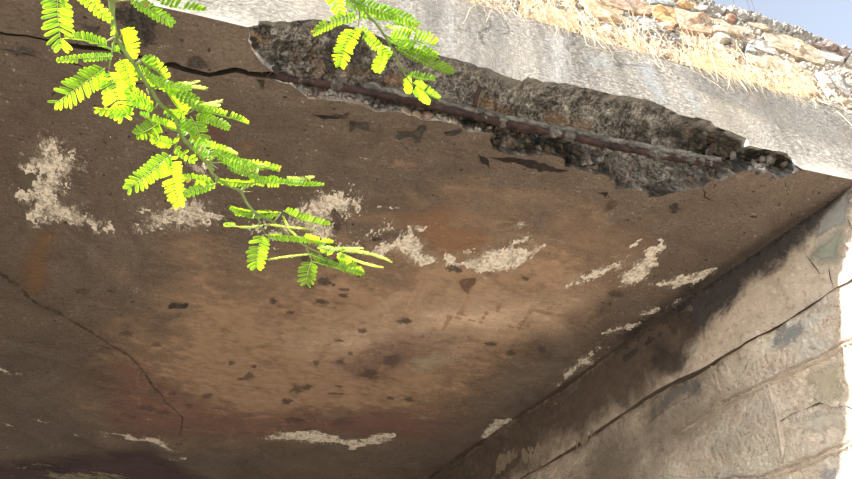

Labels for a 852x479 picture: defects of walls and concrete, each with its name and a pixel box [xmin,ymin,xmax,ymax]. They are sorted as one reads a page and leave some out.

crack [0,32,280,91]
spalling [248,20,801,198]
peeling [133,197,223,234]
damp [322,237,383,277]
peeling [244,183,546,295]
damp [306,277,350,298]
crack [0,272,184,434]
damp [425,188,852,479]
damp [111,366,474,438]
crack [779,402,852,422]
damp [0,451,196,479]